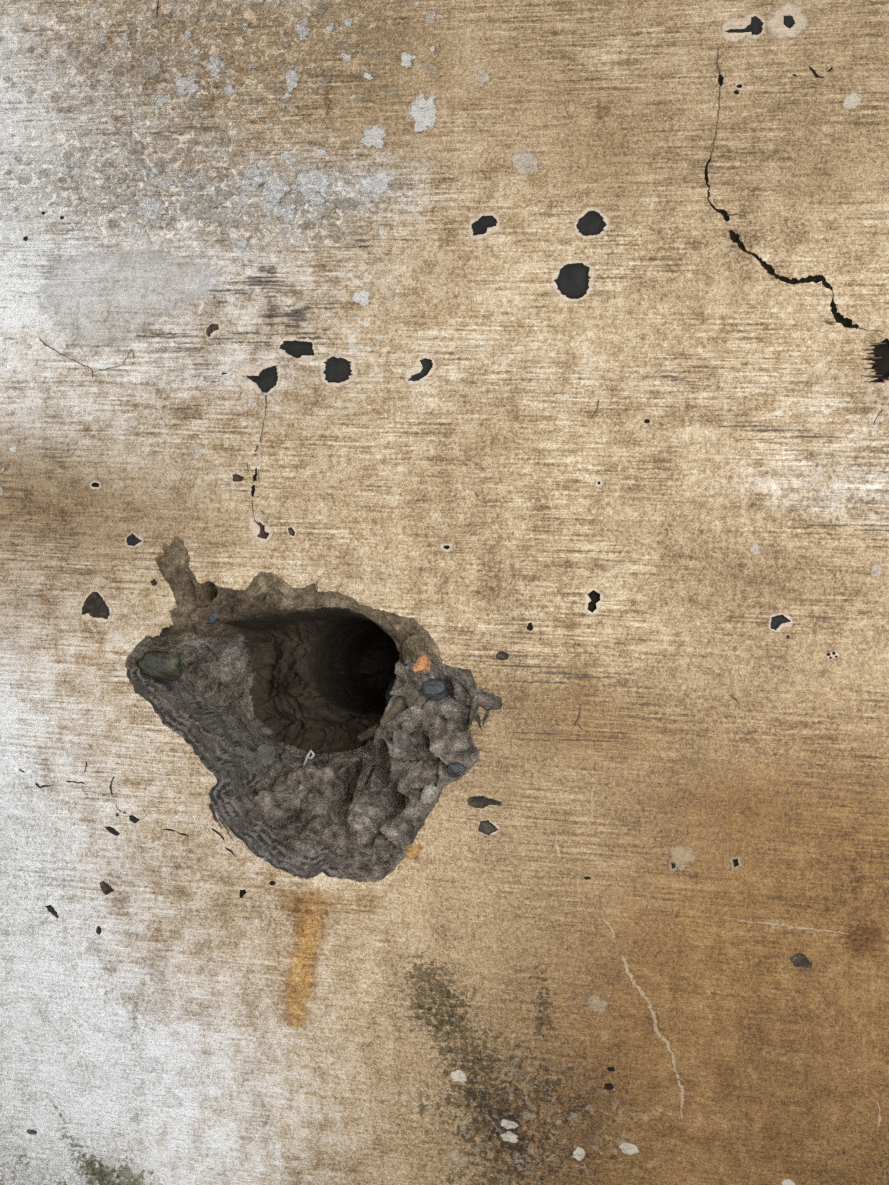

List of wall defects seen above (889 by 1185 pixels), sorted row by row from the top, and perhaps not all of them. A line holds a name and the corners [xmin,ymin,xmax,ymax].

peeling [3,76,37,99]
peeling [14,0,108,72]
peeling [123,0,301,97]
peeling [296,2,395,80]
peeling [5,86,370,247]
crack [704,46,889,425]
peeling [124,531,144,548]
spalling [125,536,502,885]
corrosion [277,884,393,1030]